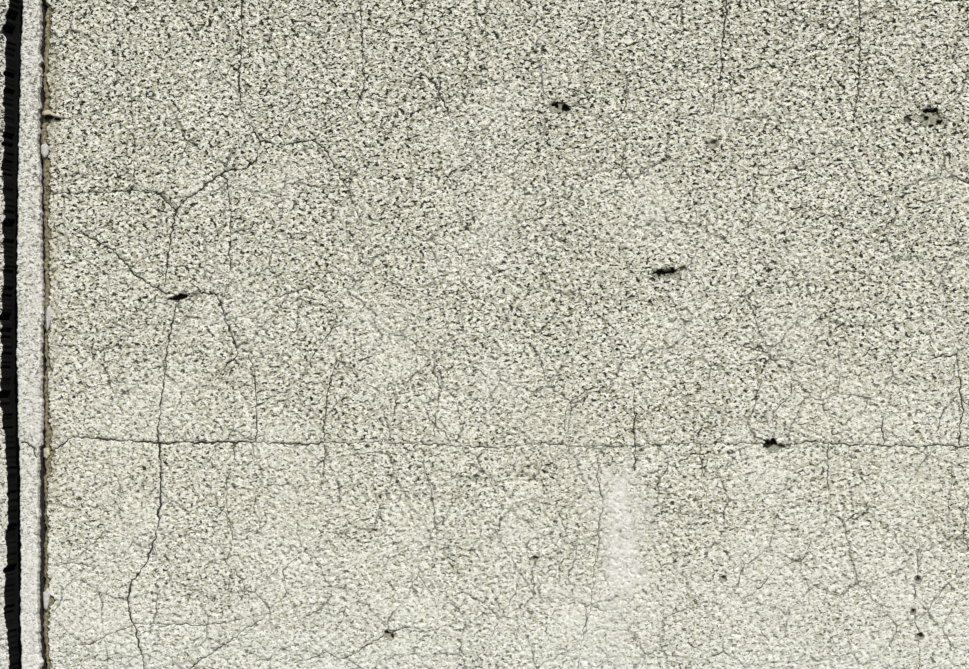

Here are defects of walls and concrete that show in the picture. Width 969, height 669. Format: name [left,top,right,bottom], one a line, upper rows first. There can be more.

crack [853,0,861,123]
crack [884,192,895,272]
crack [2,0,764,669]
crack [736,343,819,423]
crack [782,350,969,508]
crack [739,540,811,601]